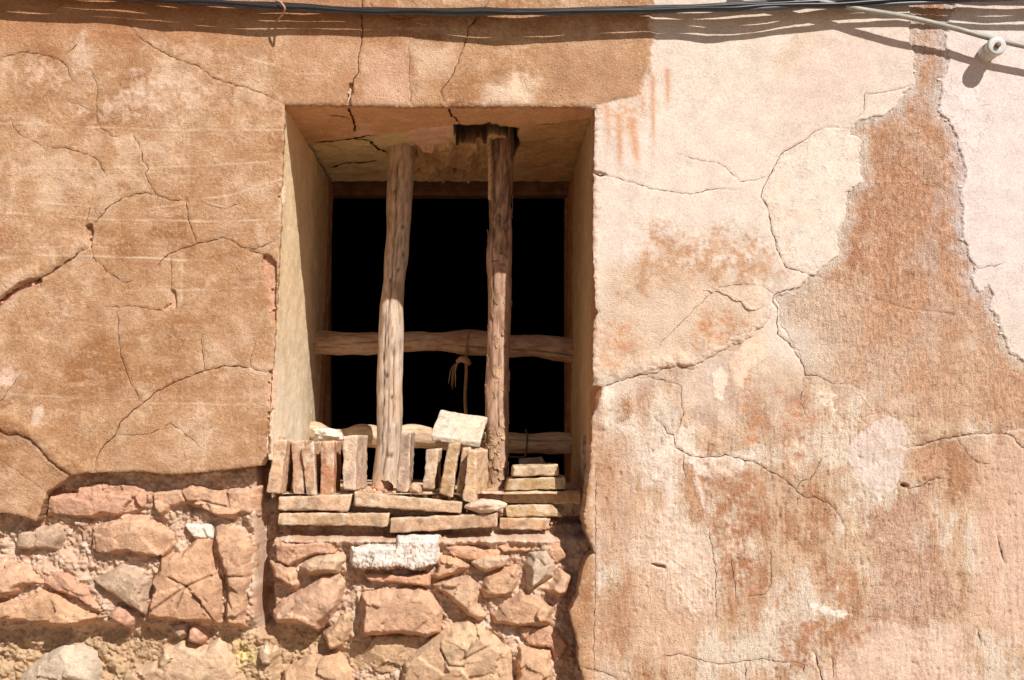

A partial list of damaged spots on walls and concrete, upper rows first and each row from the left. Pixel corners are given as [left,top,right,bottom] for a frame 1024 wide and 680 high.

crack [132,29,281,103]
crack [315,1,412,168]
crack [441,1,495,122]
crack [0,40,273,465]
crack [596,127,841,416]
peeling [774,4,1024,630]
crack [0,430,70,476]
crack [606,367,839,514]
crack [907,432,1024,464]
crack [581,468,615,678]
crack [709,530,772,611]
crack [656,653,834,680]